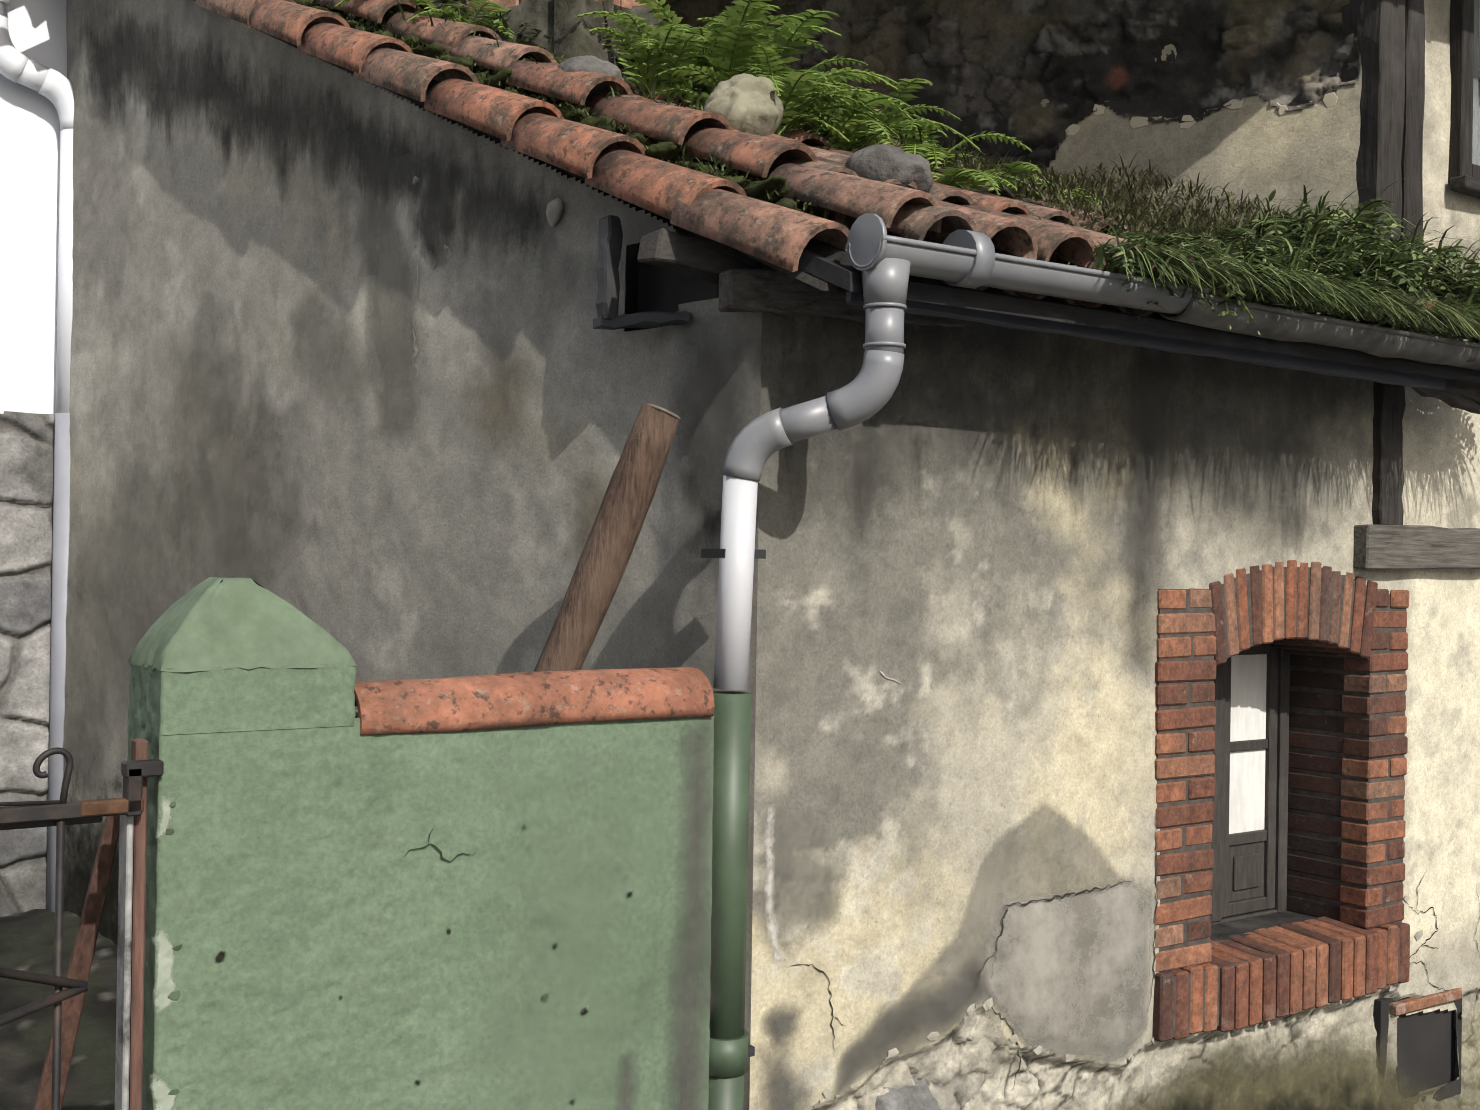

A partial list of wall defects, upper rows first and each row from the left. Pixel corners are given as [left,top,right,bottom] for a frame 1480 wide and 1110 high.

spalling [658,0,1364,175]
leakage [86,17,539,431]
crack [404,829,476,862]
crack [785,964,846,1051]
spalling [809,984,1480,1110]